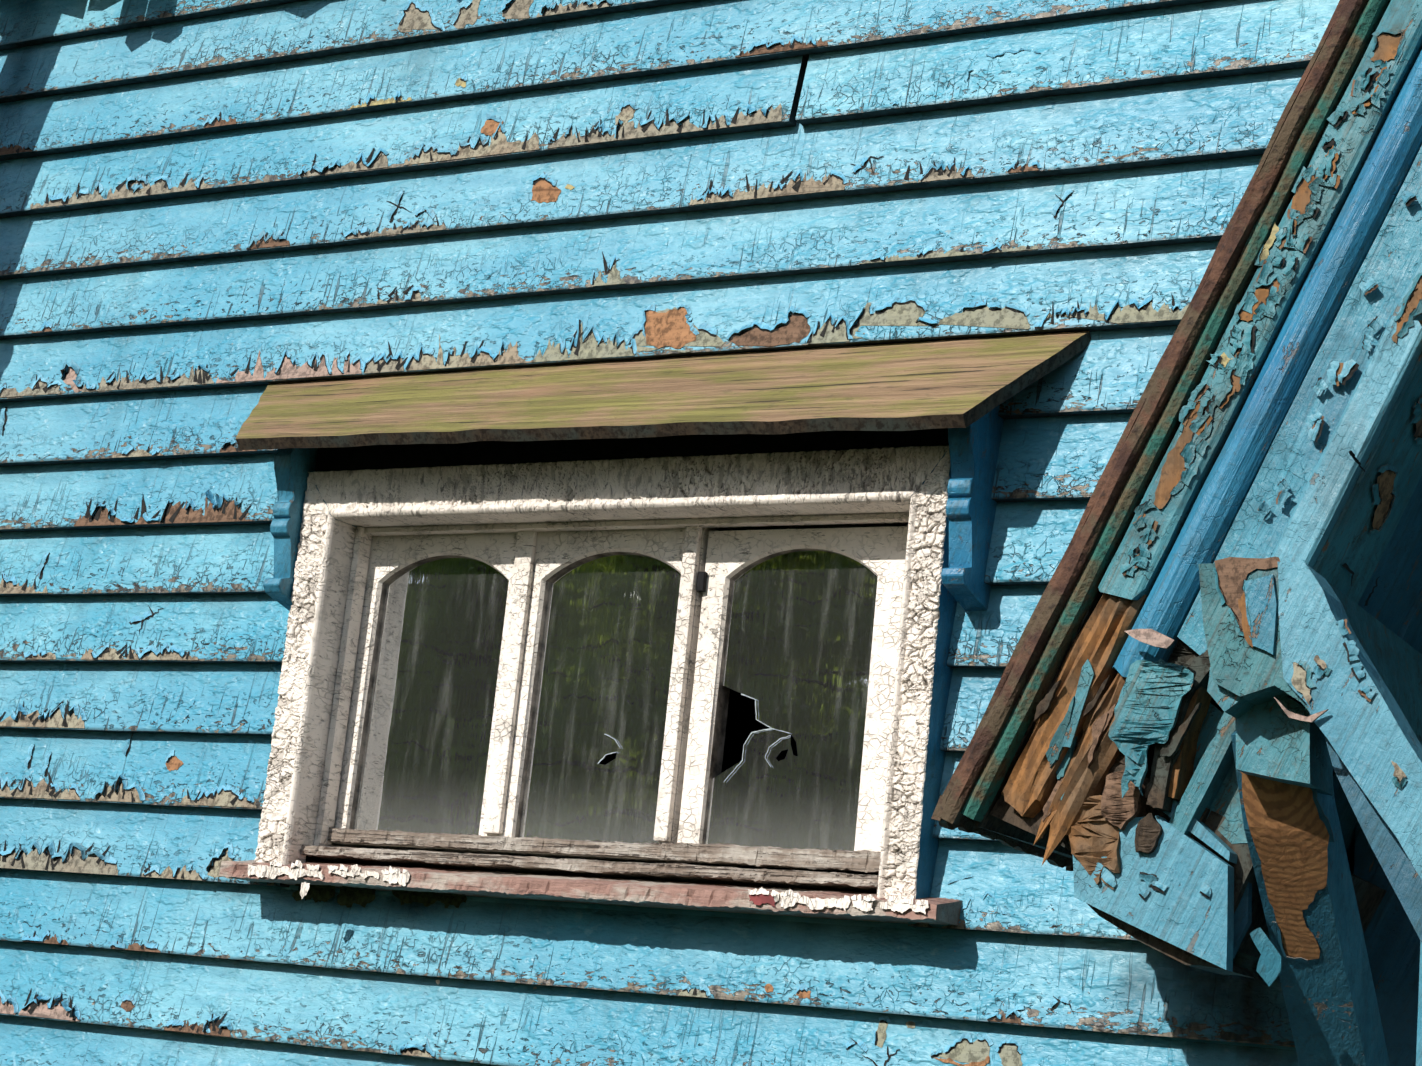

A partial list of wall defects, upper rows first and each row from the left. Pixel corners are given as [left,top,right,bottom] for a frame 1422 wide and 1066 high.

peeling [298,99,782,177]
peeling [690,167,847,205]
peeling [1120,26,1422,577]
peeling [0,295,1189,397]
peeling [74,488,252,526]
peeling [0,700,87,728]
peeling [0,772,145,803]
peeling [0,839,118,875]
peeling [1241,772,1334,987]
peeling [0,988,81,1021]
crack [845,1038,900,1066]
peeling [930,1009,1023,1066]